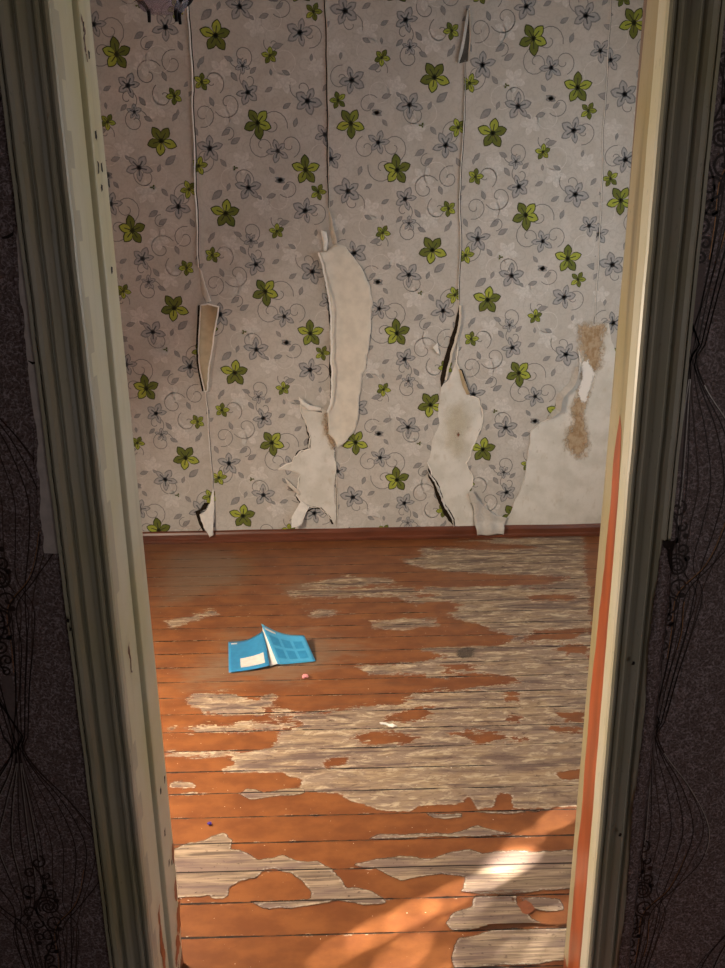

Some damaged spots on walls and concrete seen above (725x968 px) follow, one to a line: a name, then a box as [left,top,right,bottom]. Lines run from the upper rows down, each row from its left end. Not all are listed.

peeling [280,209,373,524]
flaking render [428,329,482,526]
flaking render [505,323,616,525]
peeling [240,788,305,800]
peeling [370,825,511,840]
peeling [158,833,386,968]
peeling [354,849,573,968]